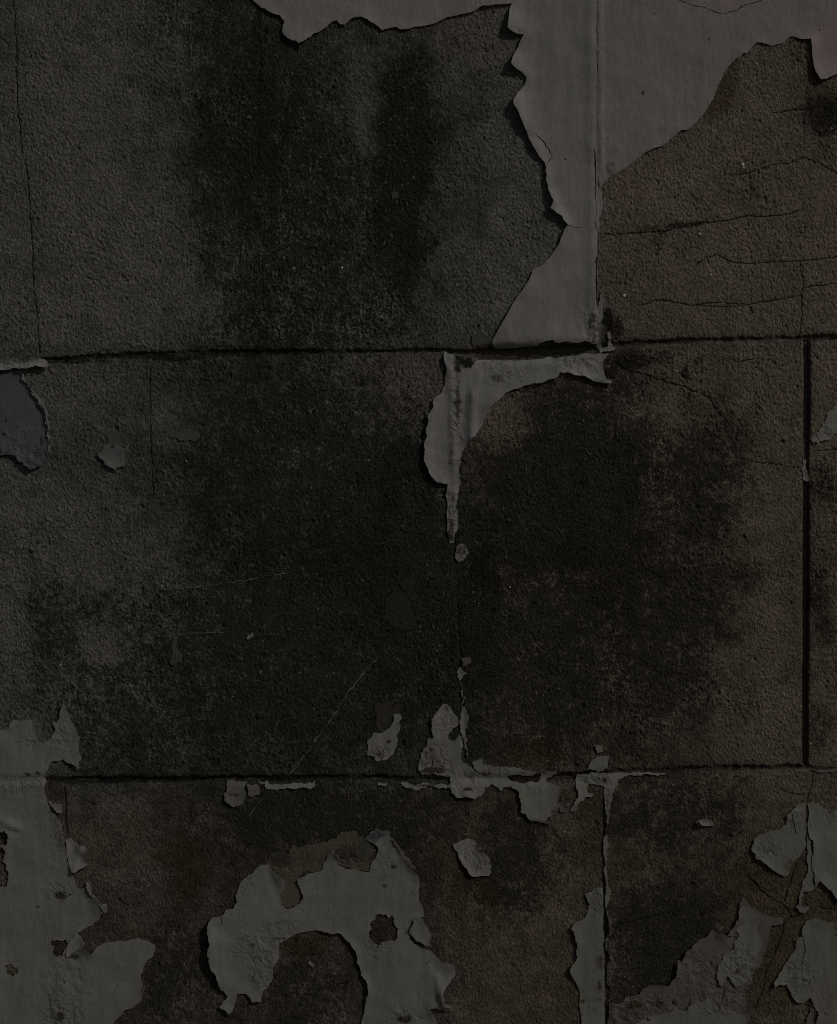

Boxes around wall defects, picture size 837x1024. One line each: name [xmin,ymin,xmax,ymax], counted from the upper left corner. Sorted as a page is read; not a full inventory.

peeling [0,356,51,470]
water stain [16,0,764,774]
peeling [253,0,837,562]
crack [569,108,837,303]
crack [642,254,837,335]
peeling [0,704,155,1024]
peeling [207,828,455,1024]
peeling [367,698,402,761]
peeling [401,657,783,1024]
crack [747,773,831,1021]
peeling [751,802,837,1024]